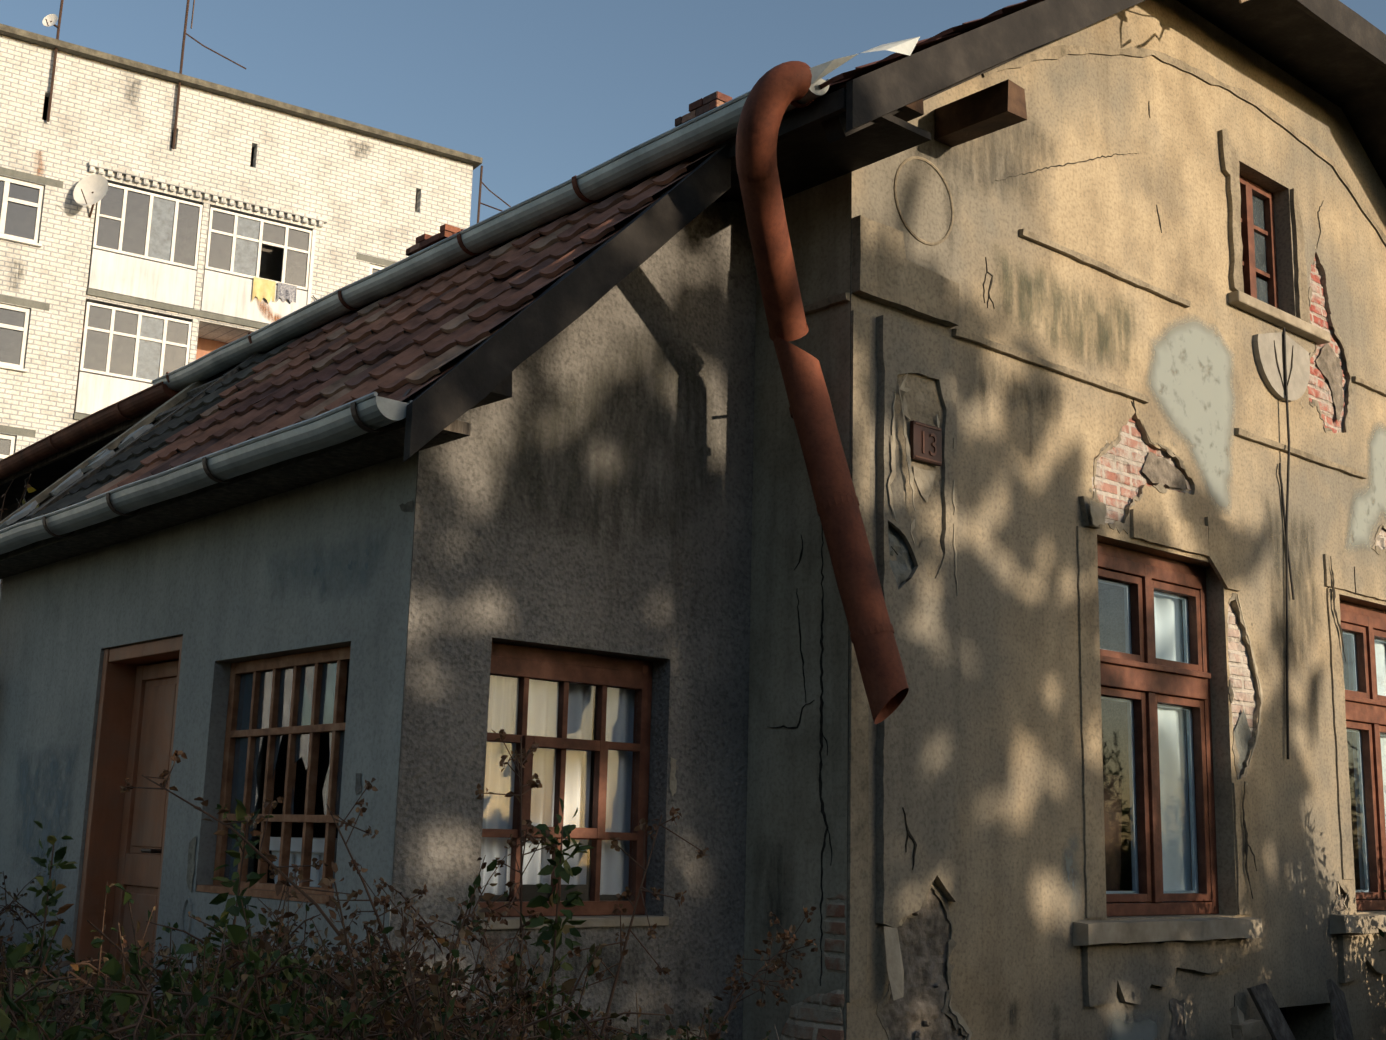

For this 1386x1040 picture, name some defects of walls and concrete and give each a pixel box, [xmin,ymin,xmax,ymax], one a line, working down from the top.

damp [1004,270,1130,355]
spalling [1301,246,1353,433]
spalling [887,373,958,596]
spalling [1089,399,1191,534]
spalling [1371,524,1386,555]
crack [767,524,832,986]
spalling [1227,593,1263,785]
spalling [876,886,972,1040]